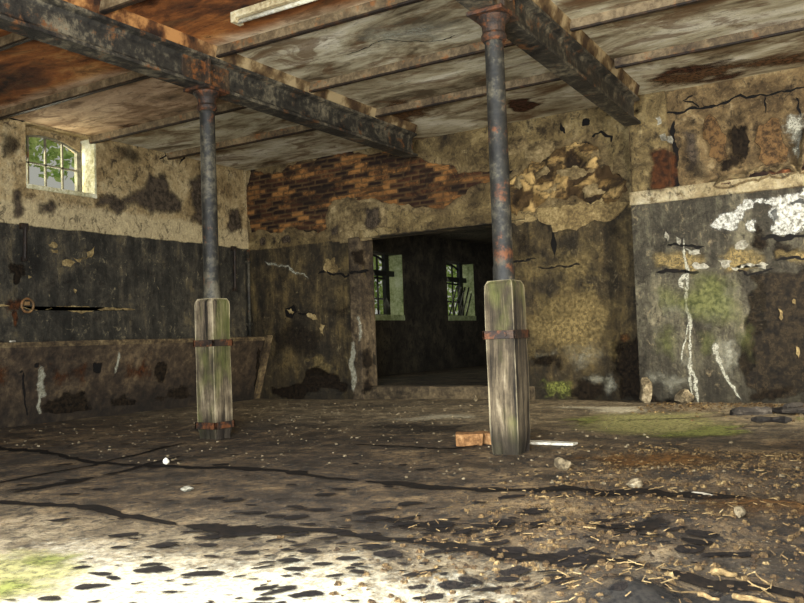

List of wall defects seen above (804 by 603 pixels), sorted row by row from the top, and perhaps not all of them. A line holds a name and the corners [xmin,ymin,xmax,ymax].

flaking render [246,148,491,239]
rust [508,98,540,112]
flaking render [509,118,632,232]
peeling [656,116,673,144]
flaking render [702,114,728,163]
crack [667,87,804,187]
flaking render [713,118,804,189]
peeling [23,306,135,314]
crack [21,373,29,415]
crack [0,442,804,599]